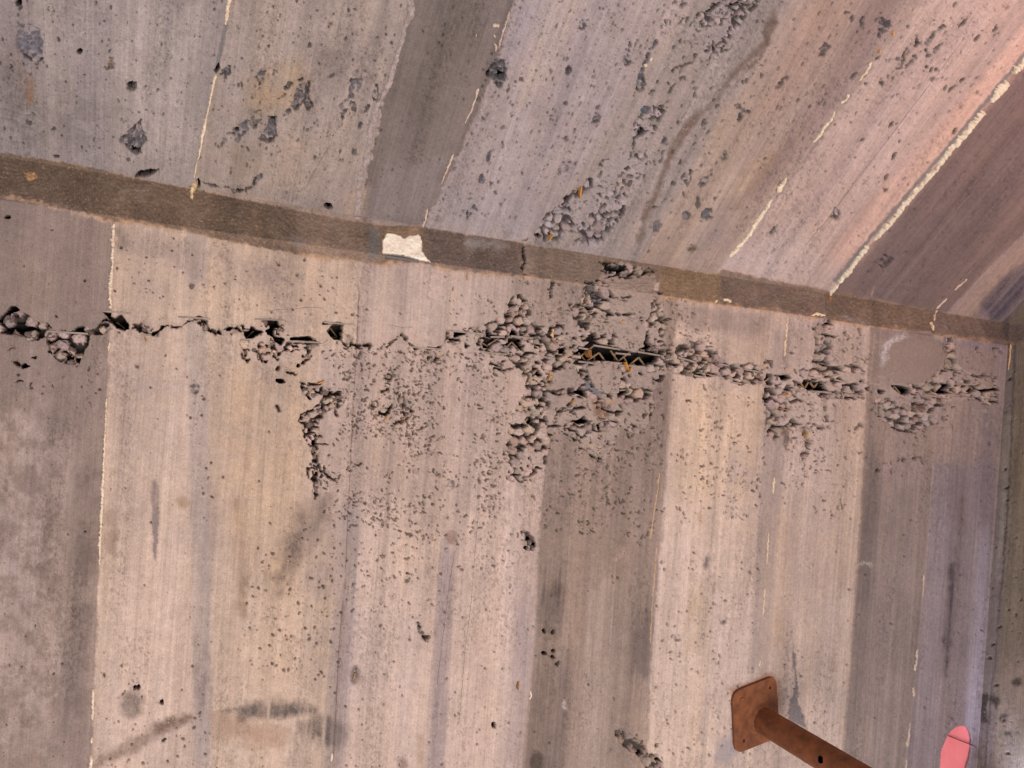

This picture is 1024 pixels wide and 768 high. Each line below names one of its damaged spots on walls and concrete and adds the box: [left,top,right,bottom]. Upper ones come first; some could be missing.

crack [88,309,248,338]
spalling [583,258,657,309]
peeling [829,245,895,296]
crack [267,297,451,569]
hole [319,345,522,547]
spalling [523,378,767,546]
spalling [781,389,954,519]